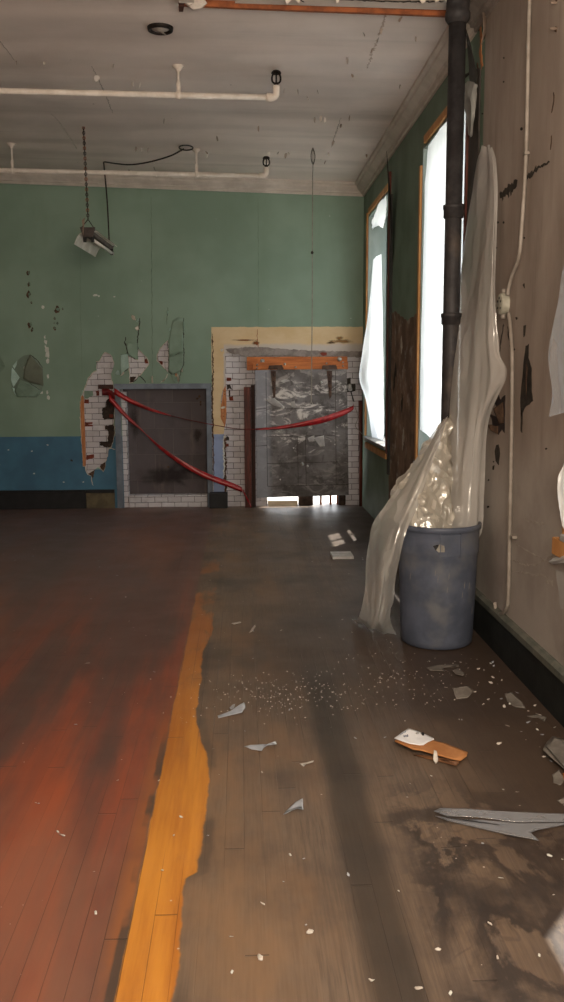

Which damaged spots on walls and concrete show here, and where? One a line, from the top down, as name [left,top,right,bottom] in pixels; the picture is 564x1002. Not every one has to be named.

crack [185,0,207,11]
crack [336,0,447,78]
peeling [0,271,63,400]
spalling [70,311,185,485]